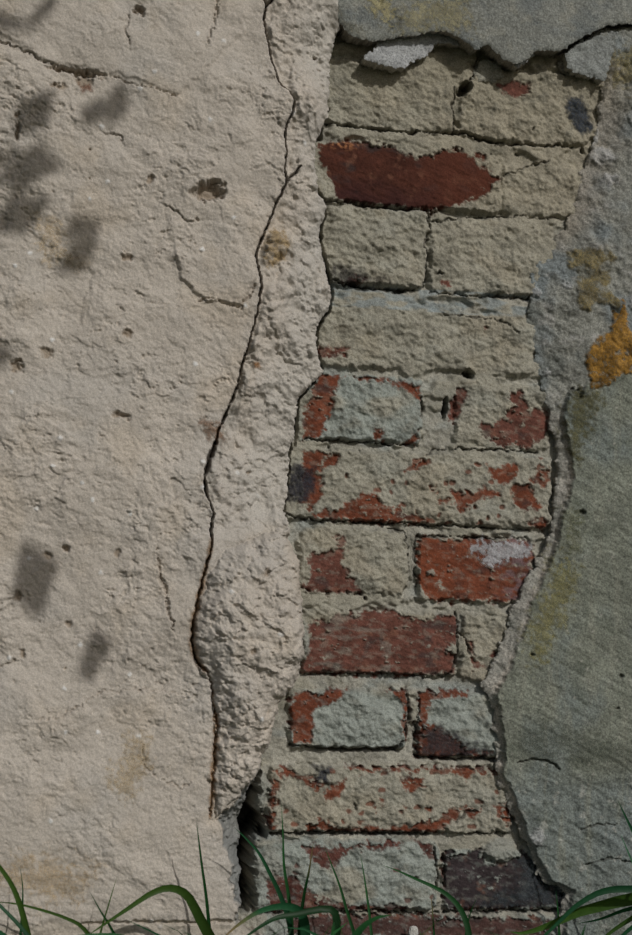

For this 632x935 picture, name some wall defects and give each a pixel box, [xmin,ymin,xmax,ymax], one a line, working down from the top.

crack [0,41,54,65]
crack [469,54,479,82]
crack [324,108,575,179]
crack [422,212,560,288]
water stain [585,299,632,389]
crack [37,0,335,820]
spalling [236,31,619,935]
crack [456,632,473,657]
crack [517,758,562,771]